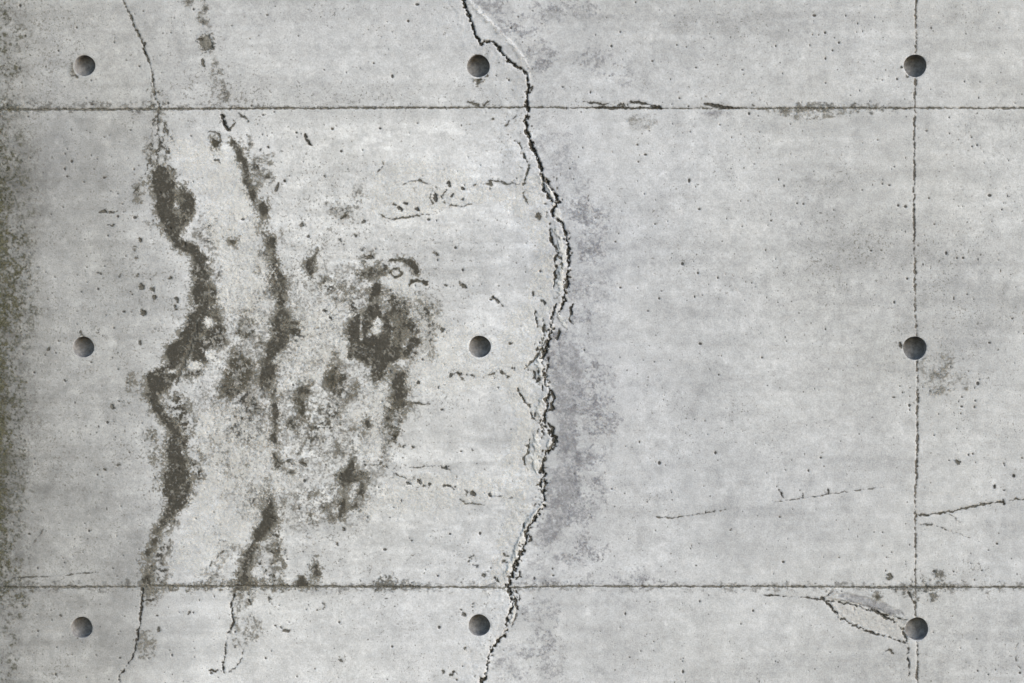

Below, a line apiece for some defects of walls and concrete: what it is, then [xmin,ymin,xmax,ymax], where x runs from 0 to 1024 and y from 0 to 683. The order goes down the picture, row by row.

crack [123,0,156,100]
leakage [126,83,441,597]
crack [462,0,574,683]
crack [778,488,873,502]
crack [919,497,1024,538]
crack [118,587,155,680]
crack [209,594,251,673]